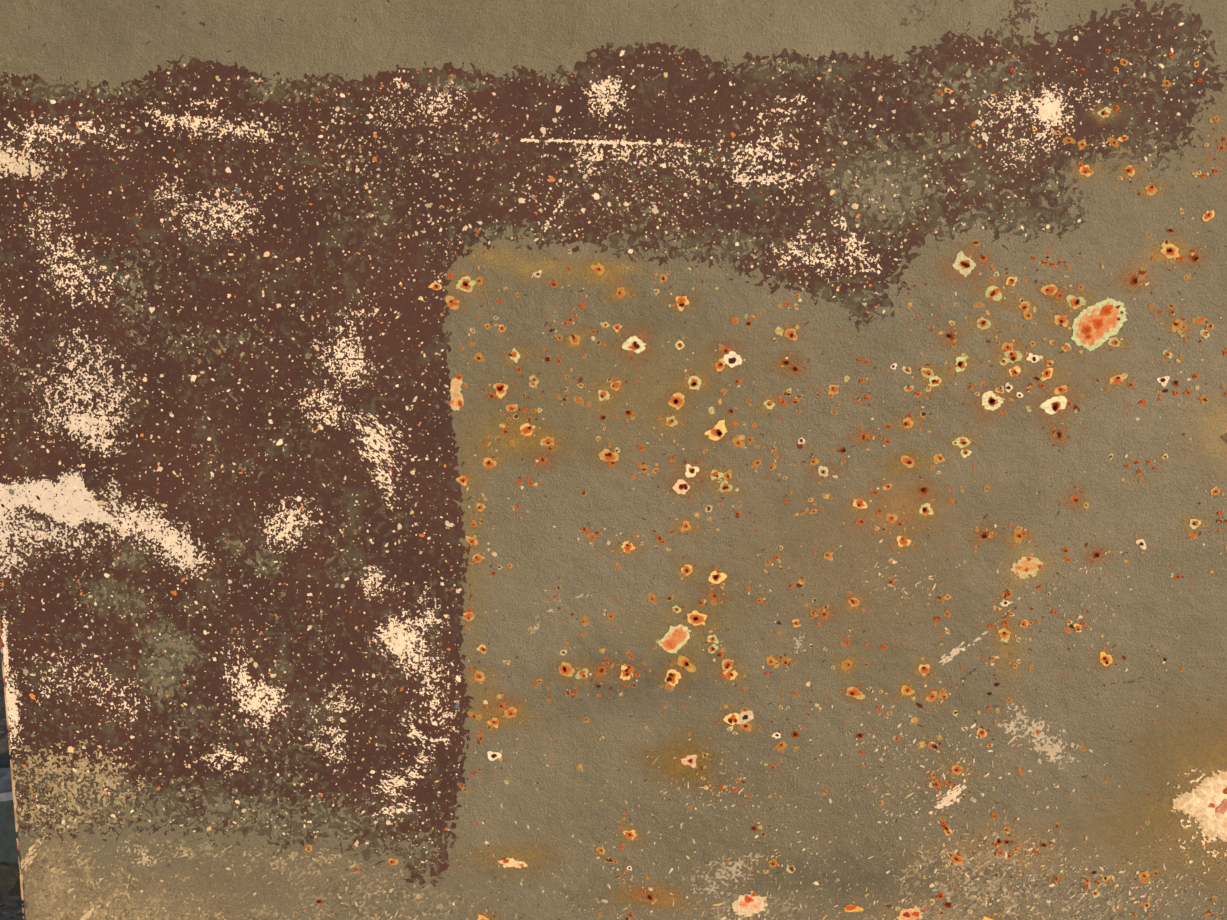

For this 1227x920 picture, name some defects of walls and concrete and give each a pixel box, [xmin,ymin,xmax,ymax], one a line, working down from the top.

rust [1192,91,1227,177]
spalling [948,251,988,277]
spalling [613,324,648,357]
peeling [711,346,742,385]
spalling [890,356,973,396]
spalling [967,341,1072,441]
spalling [705,409,754,448]
spalling [670,456,733,494]
rust [450,193,1227,920]
spalling [672,571,745,692]
spalling [558,658,641,695]
peeling [723,711,754,731]